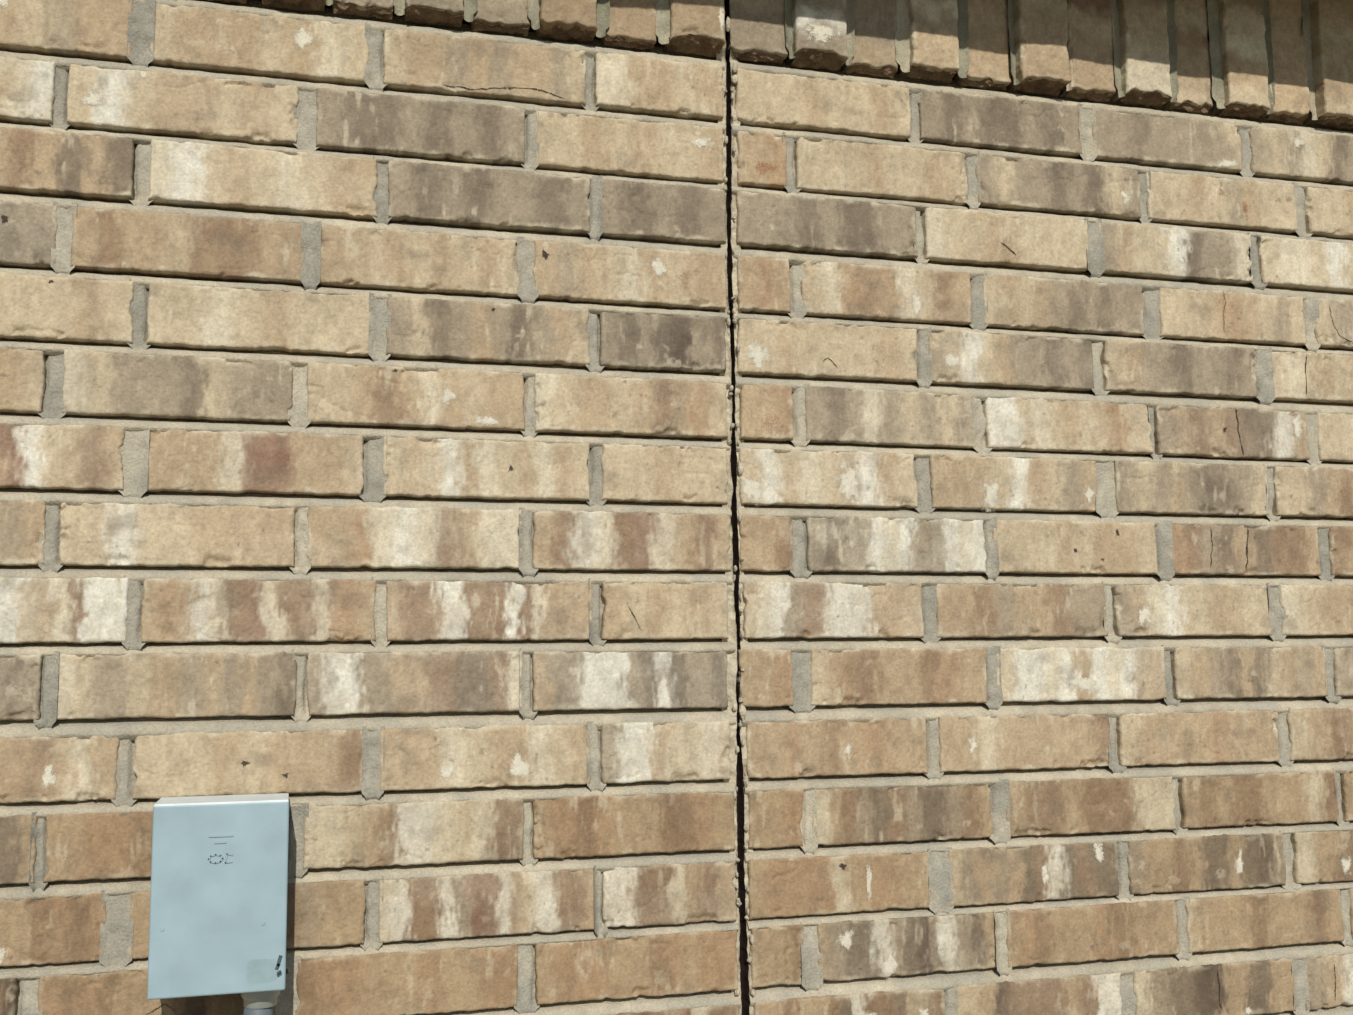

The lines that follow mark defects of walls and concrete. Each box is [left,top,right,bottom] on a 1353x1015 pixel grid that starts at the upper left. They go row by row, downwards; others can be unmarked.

crack [723,0,756,1015]